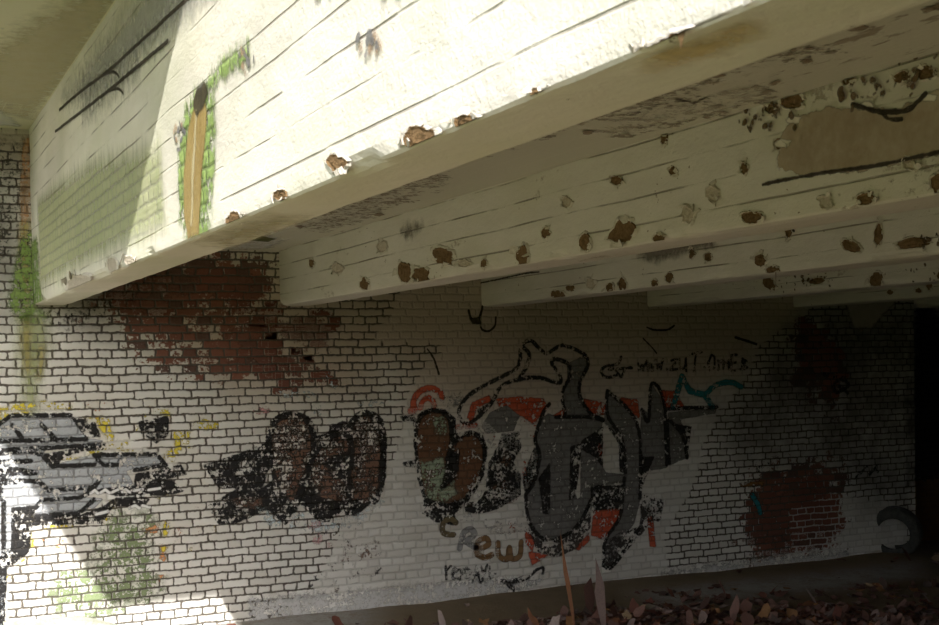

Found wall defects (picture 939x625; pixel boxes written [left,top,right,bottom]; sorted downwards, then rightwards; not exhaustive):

crack [55,0,188,133]
spalling [523,84,551,96]
peeling [582,45,939,194]
crack [851,91,928,122]
crack [762,150,939,186]
spalling [855,190,877,207]
spalling [541,225,552,240]
spalling [578,215,640,253]
damp [0,143,167,404]
spalling [392,244,489,284]
spalling [508,241,531,265]
spalling [601,271,628,292]